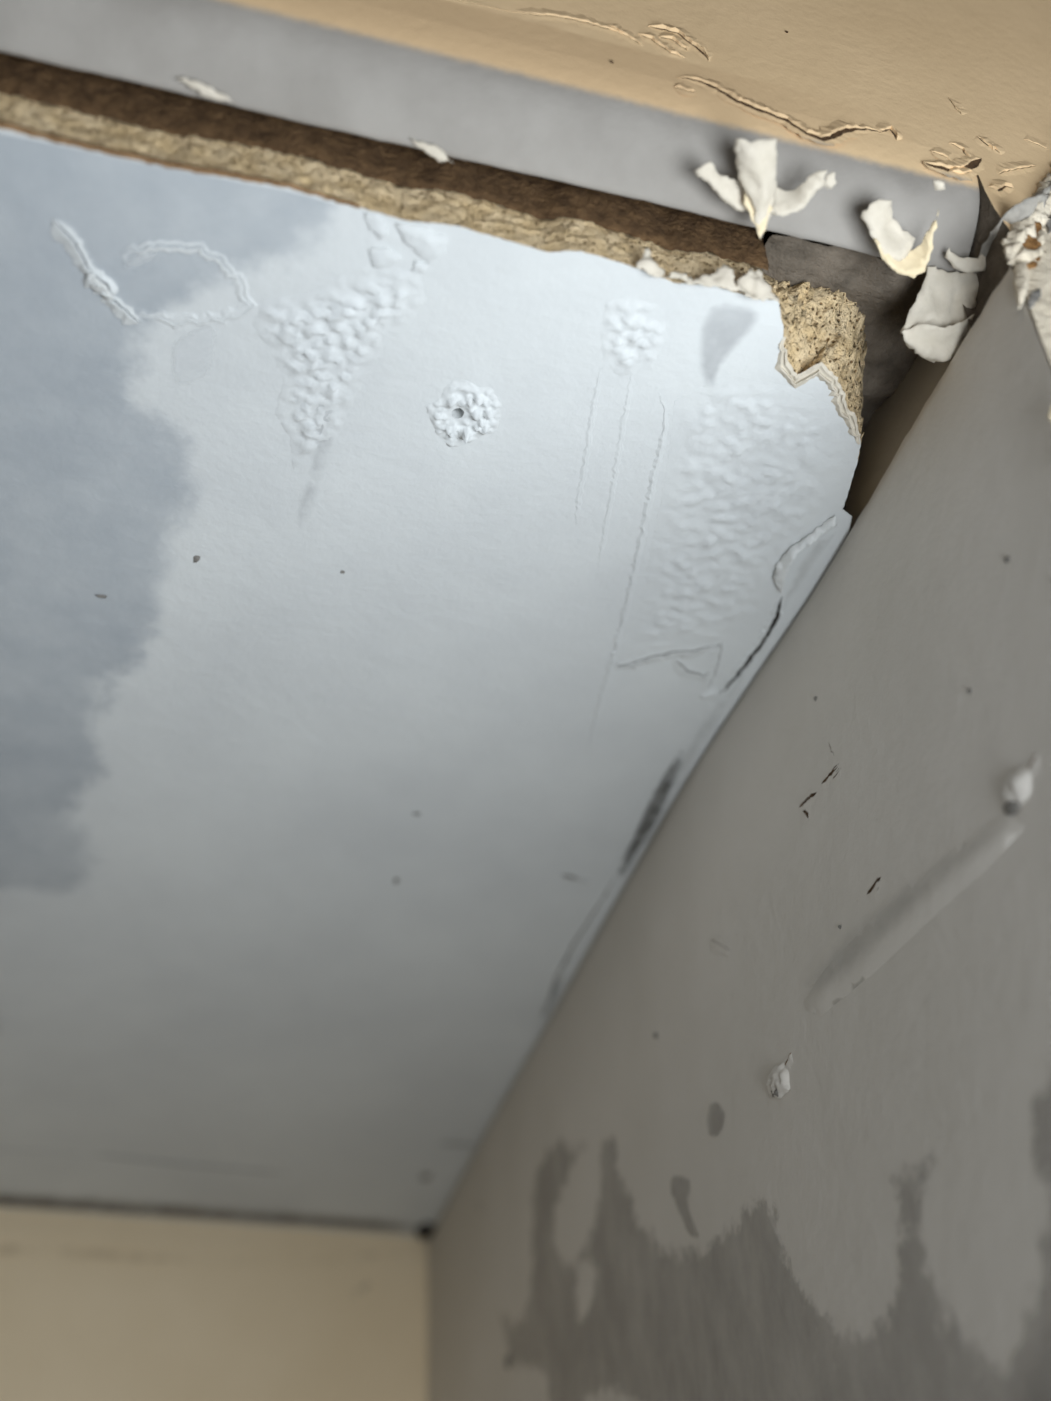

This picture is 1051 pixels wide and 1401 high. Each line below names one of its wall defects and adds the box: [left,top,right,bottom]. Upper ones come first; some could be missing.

peeling [175,77,233,103]
peeling [410,138,454,163]
peeling [694,138,836,240]
crack [674,75,1048,197]
spalling [1013,212,1051,365]
peeling [700,515,837,700]
leakage [620,762,680,872]
spalling [1003,801,1021,816]